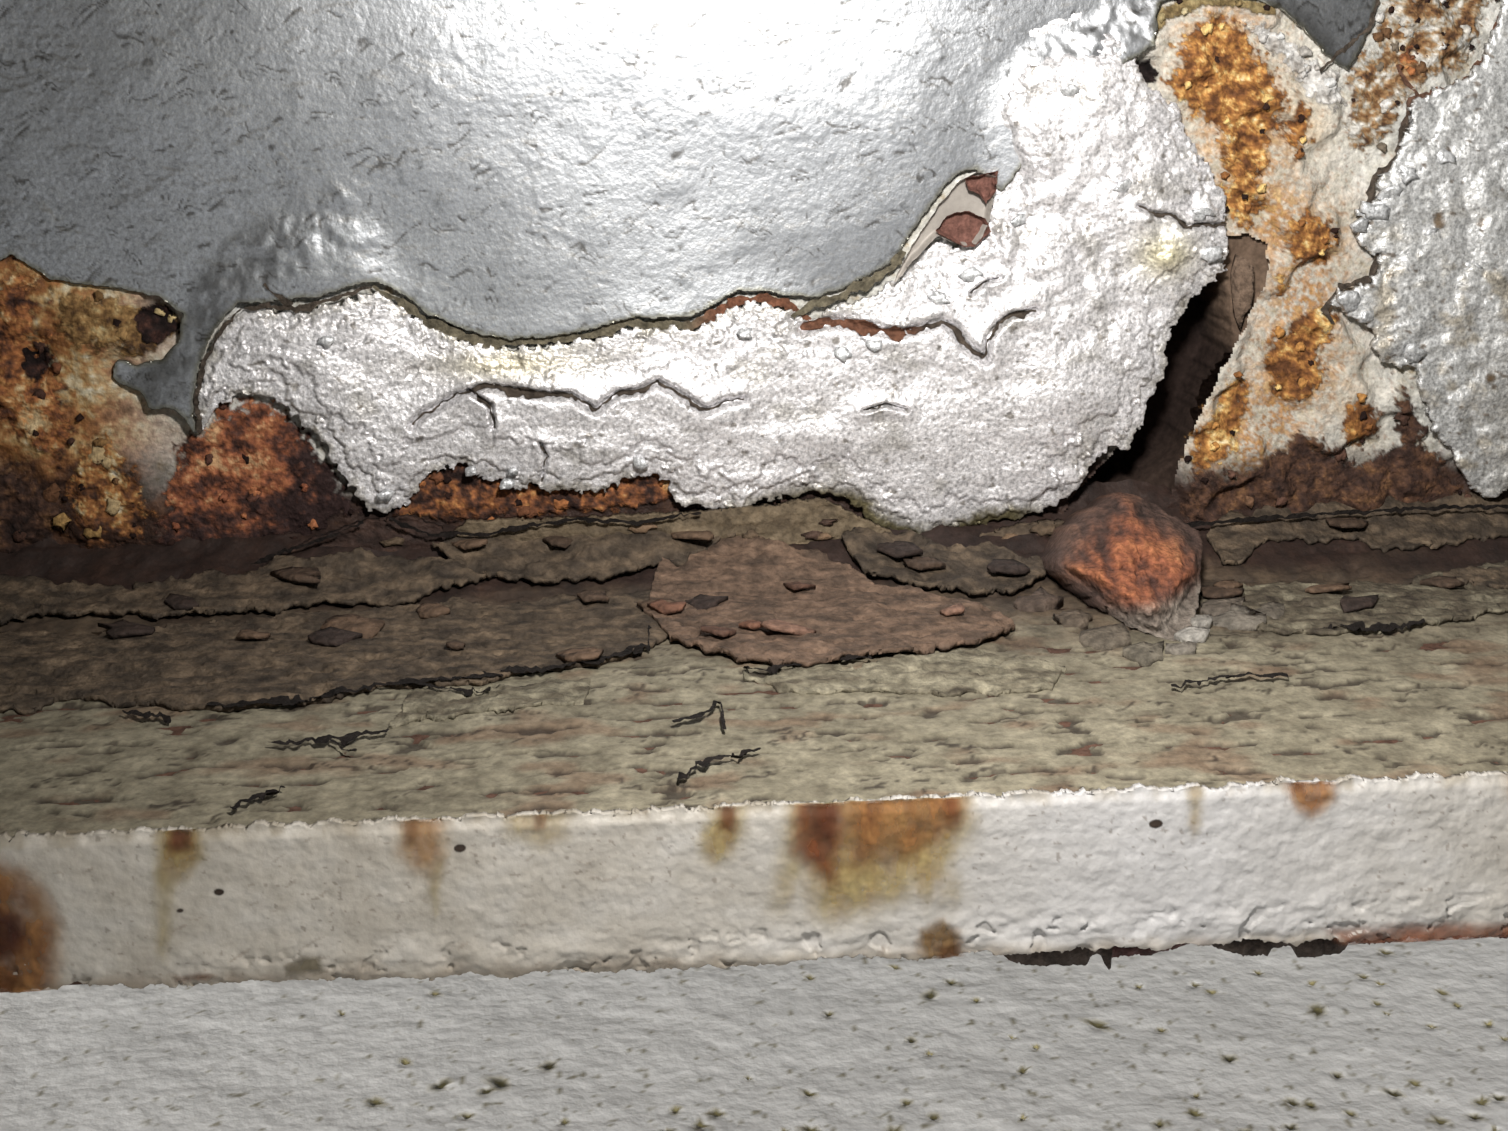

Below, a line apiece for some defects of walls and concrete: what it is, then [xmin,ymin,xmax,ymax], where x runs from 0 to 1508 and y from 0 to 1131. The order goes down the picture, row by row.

peeling [1029,11,1087,37]
corrosion [1156,0,1315,231]
crack [1138,205,1227,229]
spalling [21,346,54,383]
spalling [134,303,179,344]
corrosion [0,258,365,565]
corrosion [389,463,701,538]
crack [194,250,1037,433]
peeling [194,34,1229,570]
corrosion [1263,306,1340,402]
corrosion [1179,371,1508,528]
corrosion [798,797,960,906]